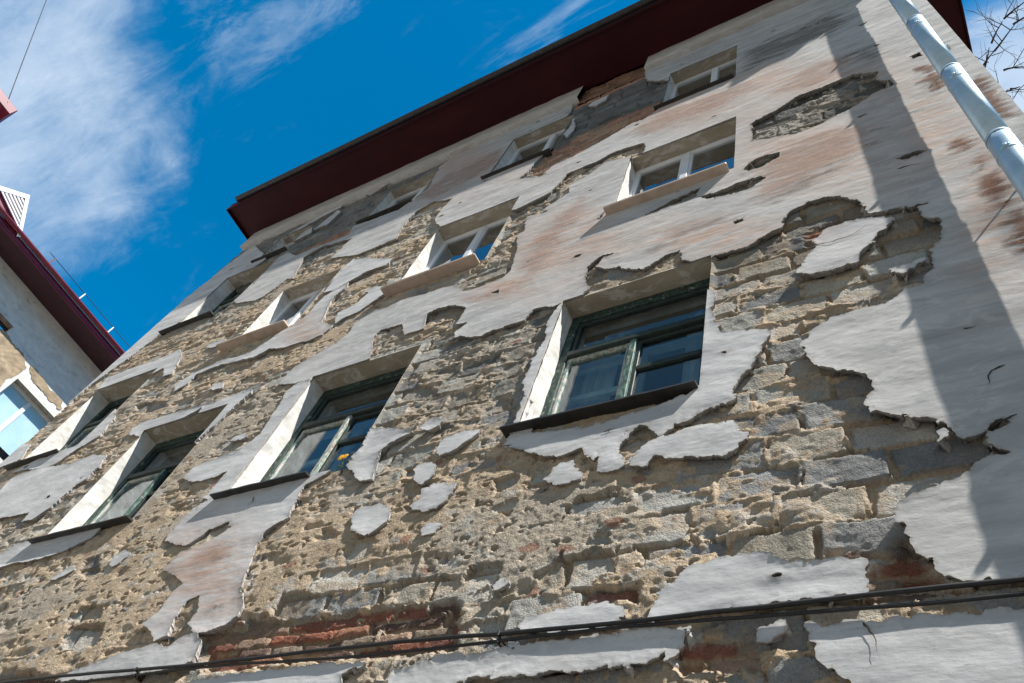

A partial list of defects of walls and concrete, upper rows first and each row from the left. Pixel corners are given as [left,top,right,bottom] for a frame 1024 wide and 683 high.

spalling [524,67,669,178]
spalling [752,74,893,140]
spalling [0,145,1024,683]